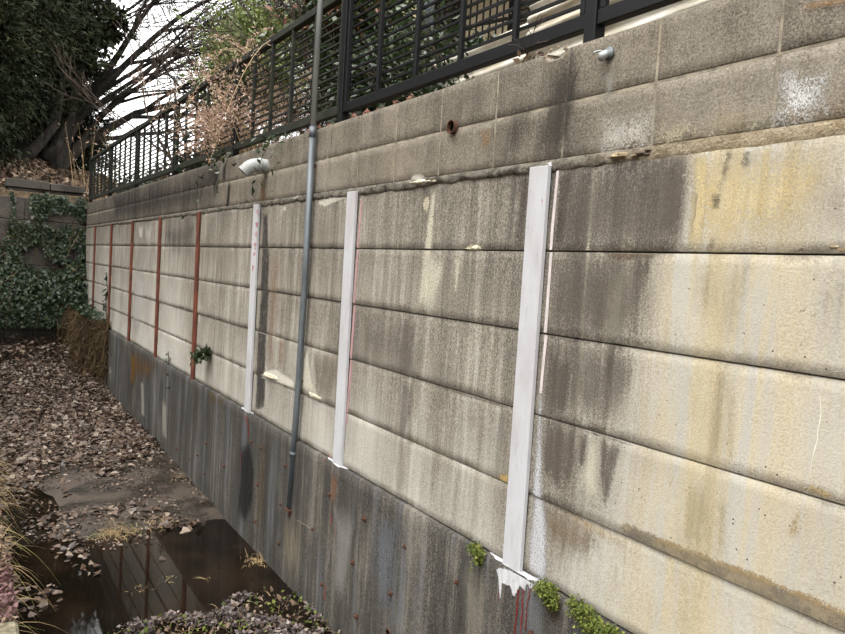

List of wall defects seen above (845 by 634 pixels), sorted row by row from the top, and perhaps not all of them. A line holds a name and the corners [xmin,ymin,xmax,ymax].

leakage [238,444,254,518]
leakage [570,422,623,499]
crack [810,394,821,478]
leakage [324,512,354,597]
leakage [546,511,619,554]
leakage [622,523,845,632]